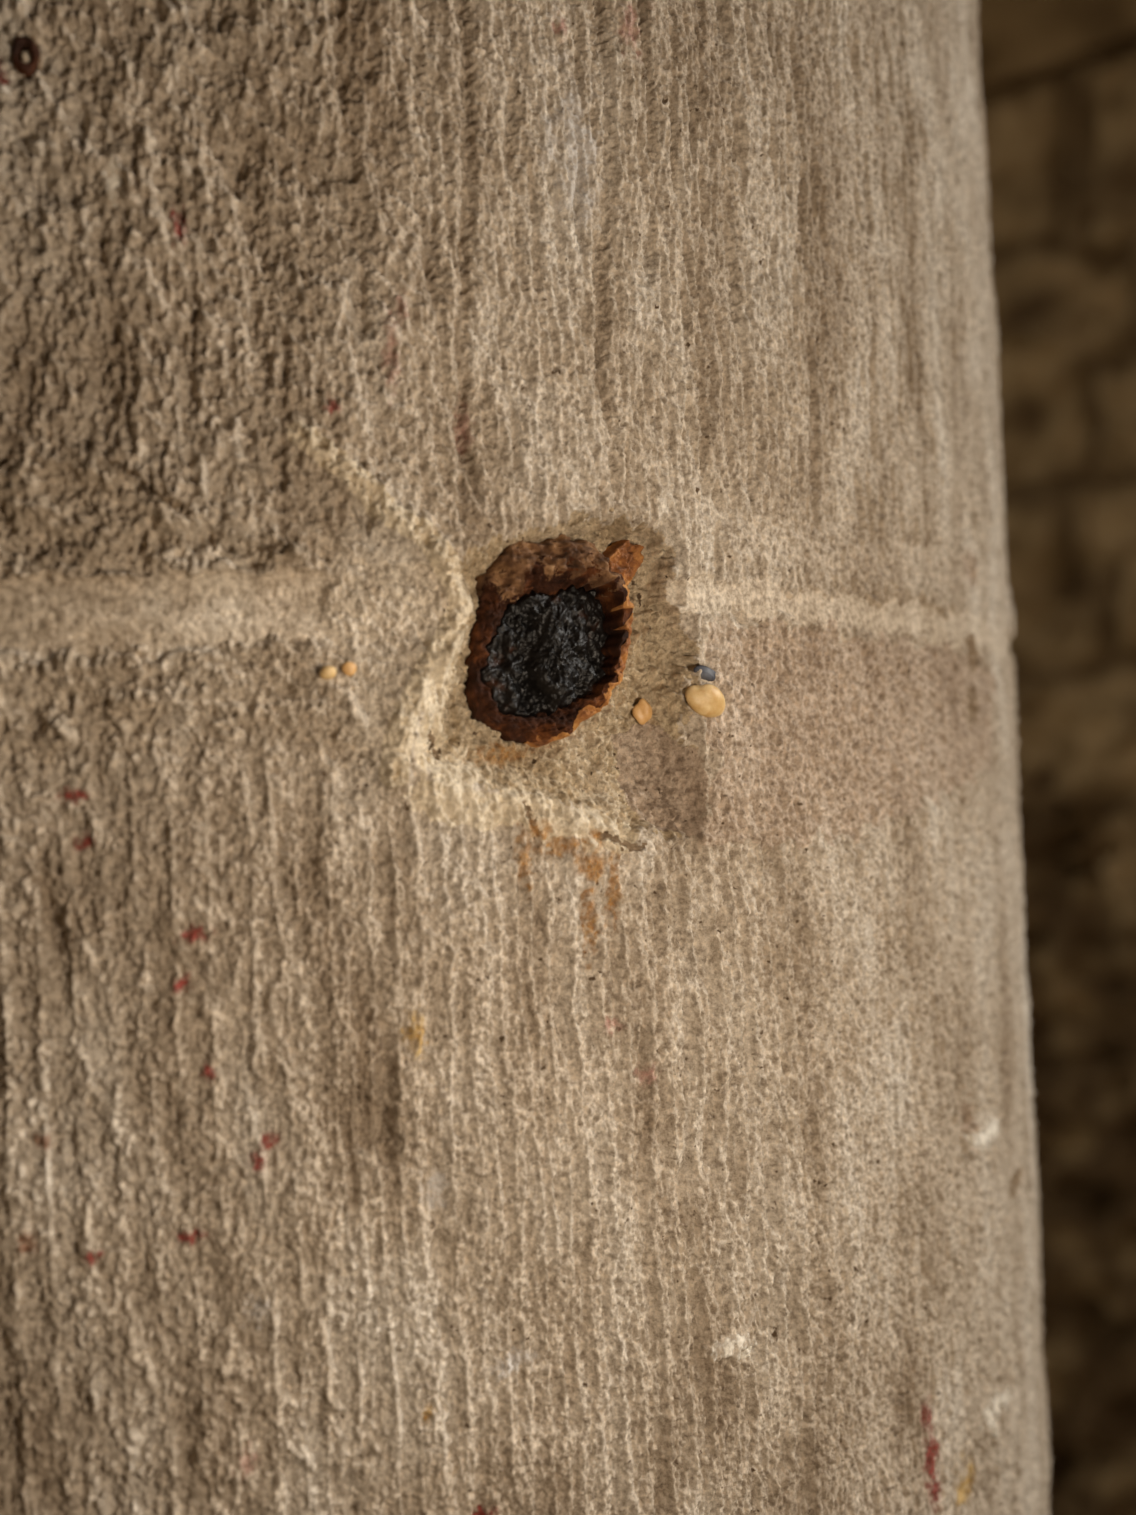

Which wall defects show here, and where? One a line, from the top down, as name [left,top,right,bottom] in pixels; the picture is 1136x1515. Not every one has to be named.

rust [489,540,644,762]